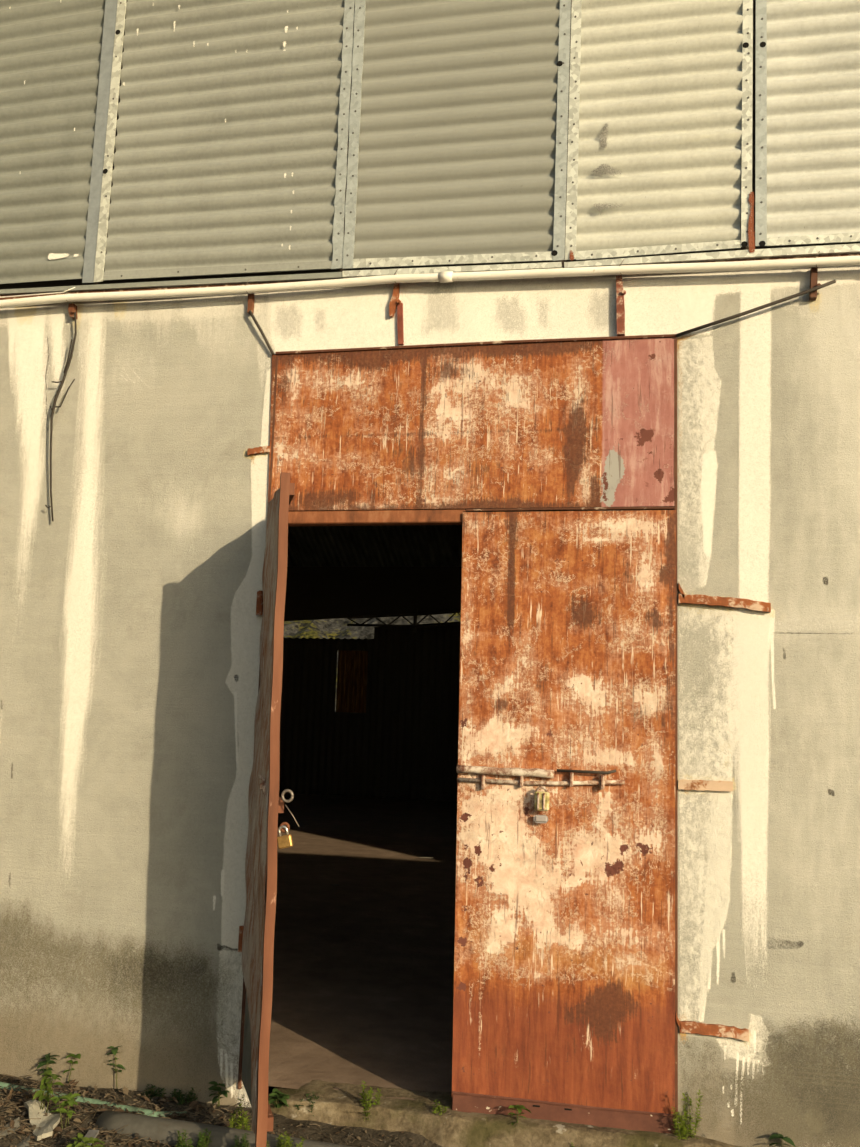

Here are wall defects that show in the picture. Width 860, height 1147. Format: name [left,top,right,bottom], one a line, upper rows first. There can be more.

leakage [7,292,273,886]
leakage [0,892,236,1103]
leakage [678,1011,860,1147]